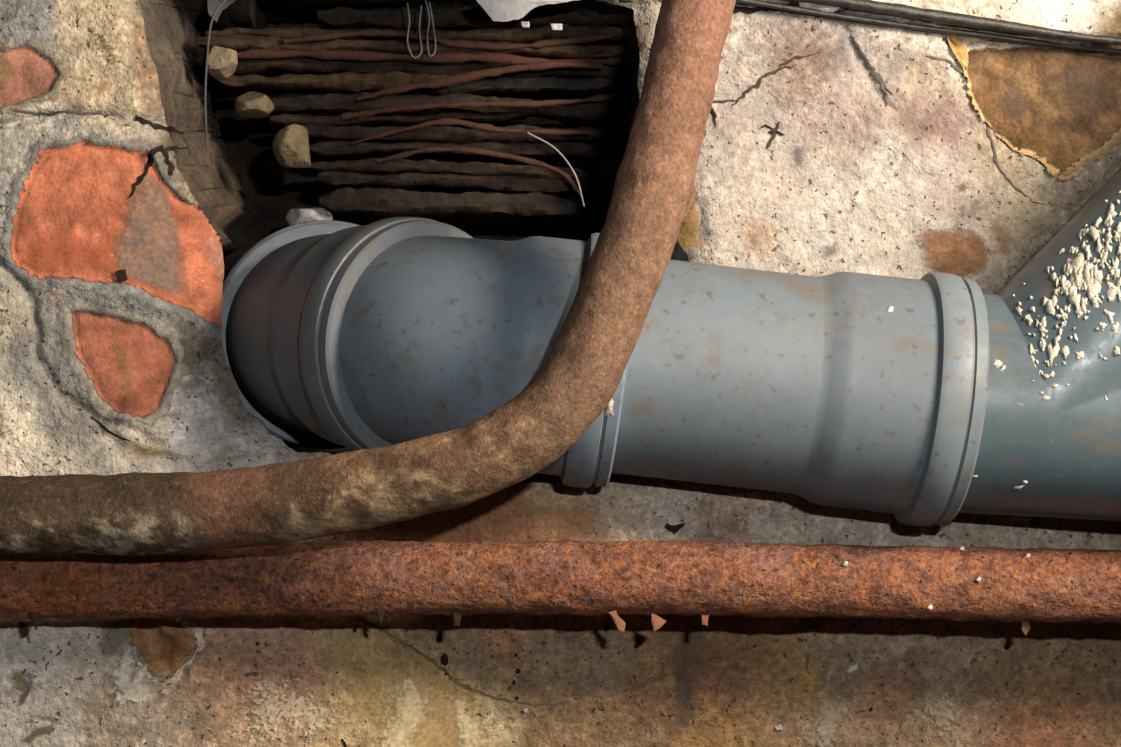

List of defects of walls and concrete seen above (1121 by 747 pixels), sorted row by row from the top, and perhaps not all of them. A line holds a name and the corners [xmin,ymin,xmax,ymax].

flaking render [476,0,576,27]
flaking render [0,38,68,114]
crack [14,109,189,198]
crack [711,54,816,128]
crack [760,122,785,149]
flaking render [946,27,1121,181]
flaking render [0,133,224,426]
rust [920,230,988,278]
flaking render [119,617,205,704]